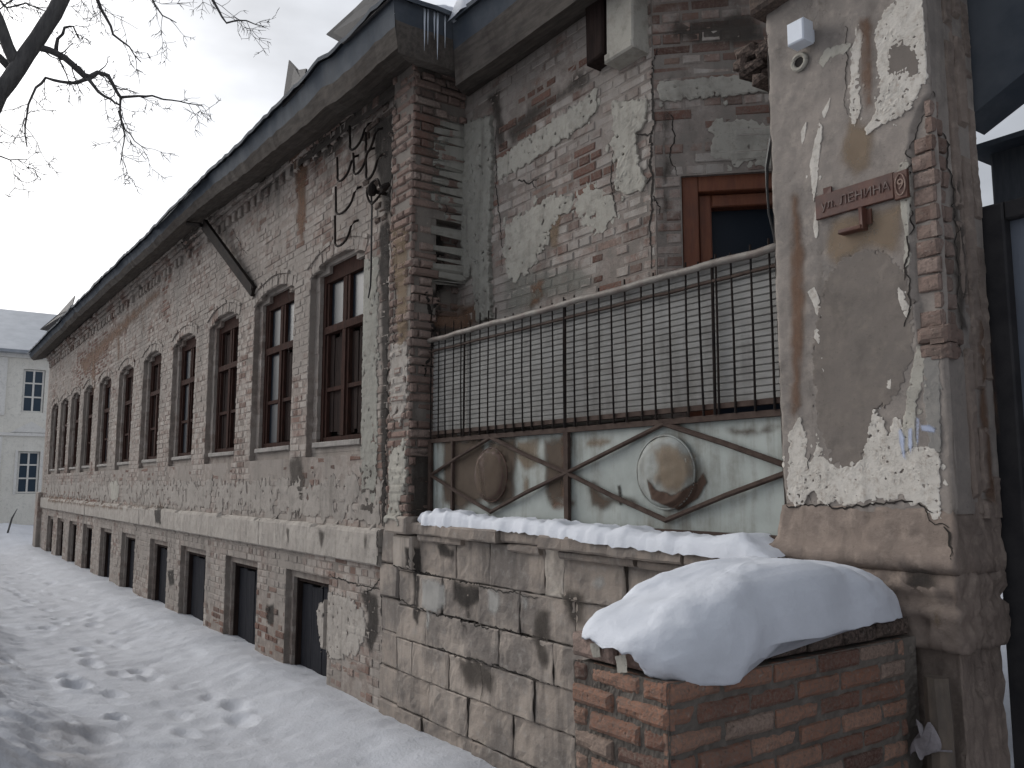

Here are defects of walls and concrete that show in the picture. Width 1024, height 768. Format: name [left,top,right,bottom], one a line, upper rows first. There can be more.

flaking render [491,71,771,283]
crack [637,49,678,269]
spalling [819,0,964,360]
crack [903,91,961,327]
water stain [434,438,517,510]
water stain [545,440,564,503]
corrosion [647,447,707,510]
flaking render [782,407,948,520]
crack [786,455,953,560]
flaking render [316,590,366,688]
water stain [362,592,378,650]
water stain [405,548,498,627]